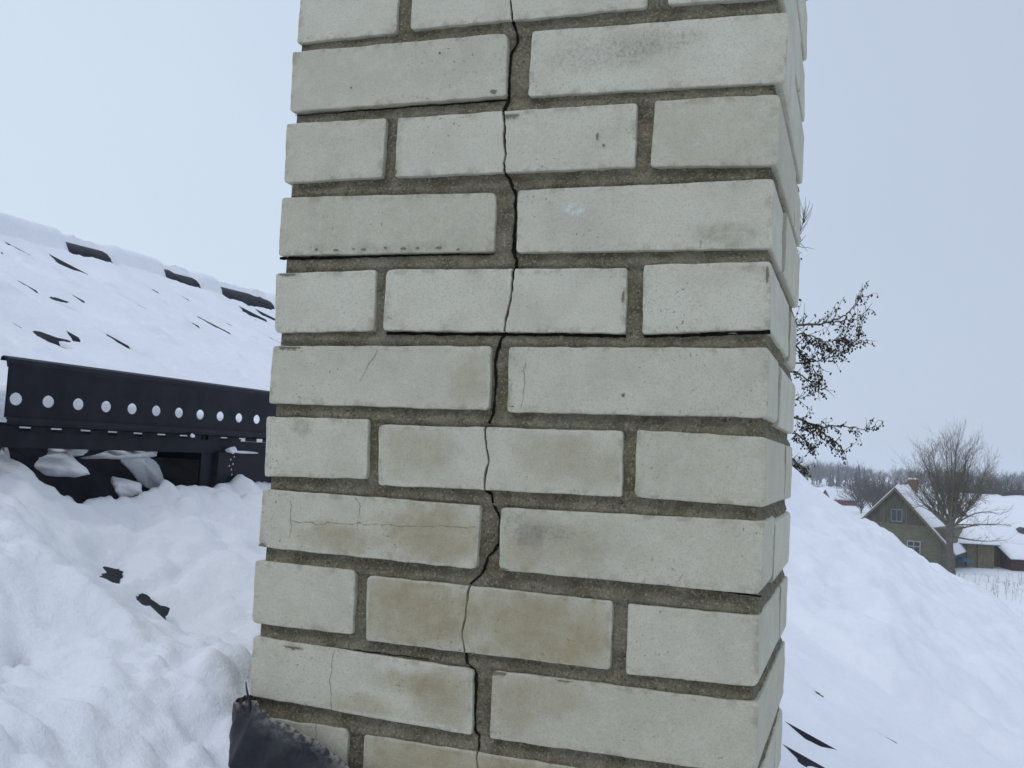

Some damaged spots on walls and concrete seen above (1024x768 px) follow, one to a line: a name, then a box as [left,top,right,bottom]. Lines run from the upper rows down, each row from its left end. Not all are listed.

crack [280,2,771,768]